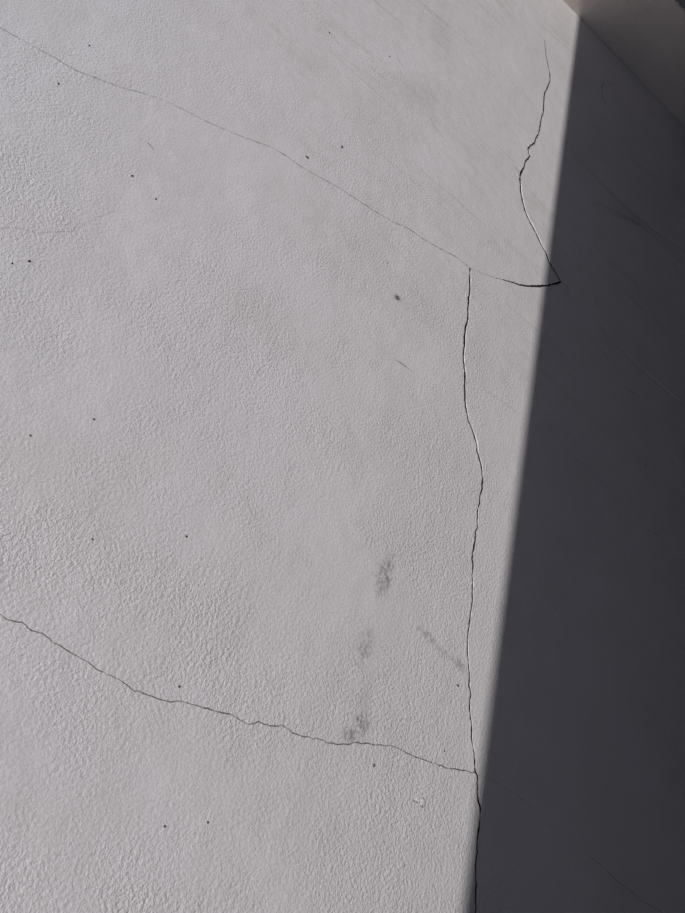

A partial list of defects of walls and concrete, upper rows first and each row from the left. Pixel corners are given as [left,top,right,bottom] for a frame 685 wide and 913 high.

crack [503,48,561,287]
crack [3,178,483,913]